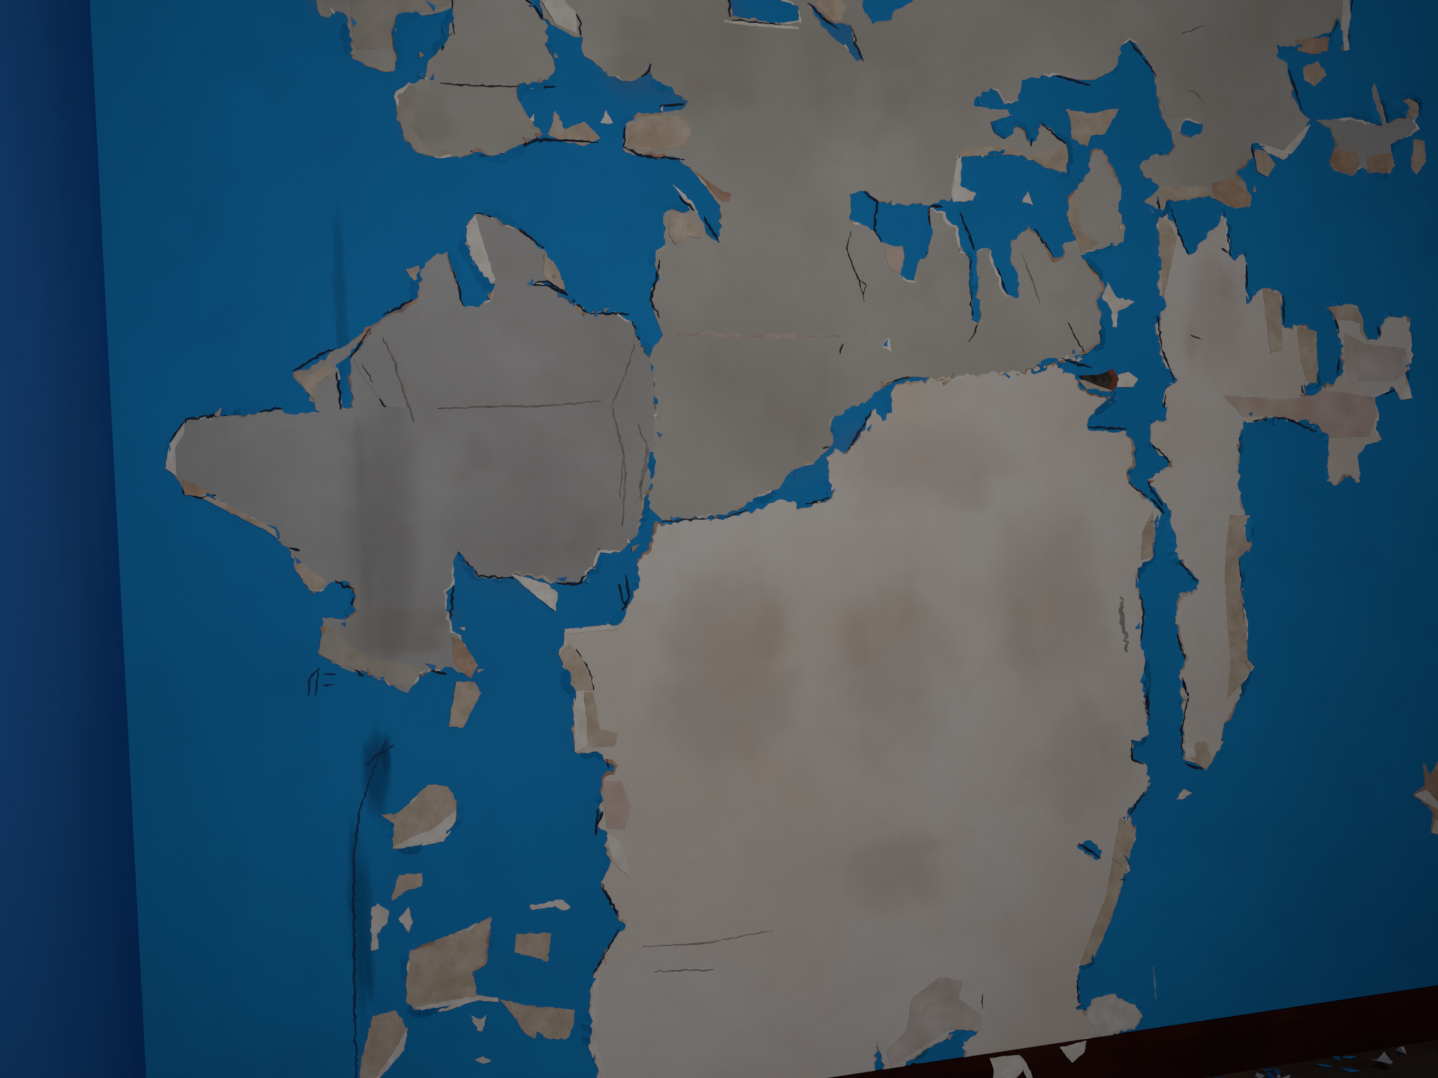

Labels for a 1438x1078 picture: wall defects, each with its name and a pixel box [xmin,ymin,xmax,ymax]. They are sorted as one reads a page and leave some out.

peeling [164,0,1426,770]
peeling [558,355,1165,1078]
peeling [382,784,464,855]
peeling [1413,762,1438,835]
peeling [370,873,423,951]
peeling [530,899,570,910]
peeling [400,917,575,1040]
peeling [360,1010,408,1078]